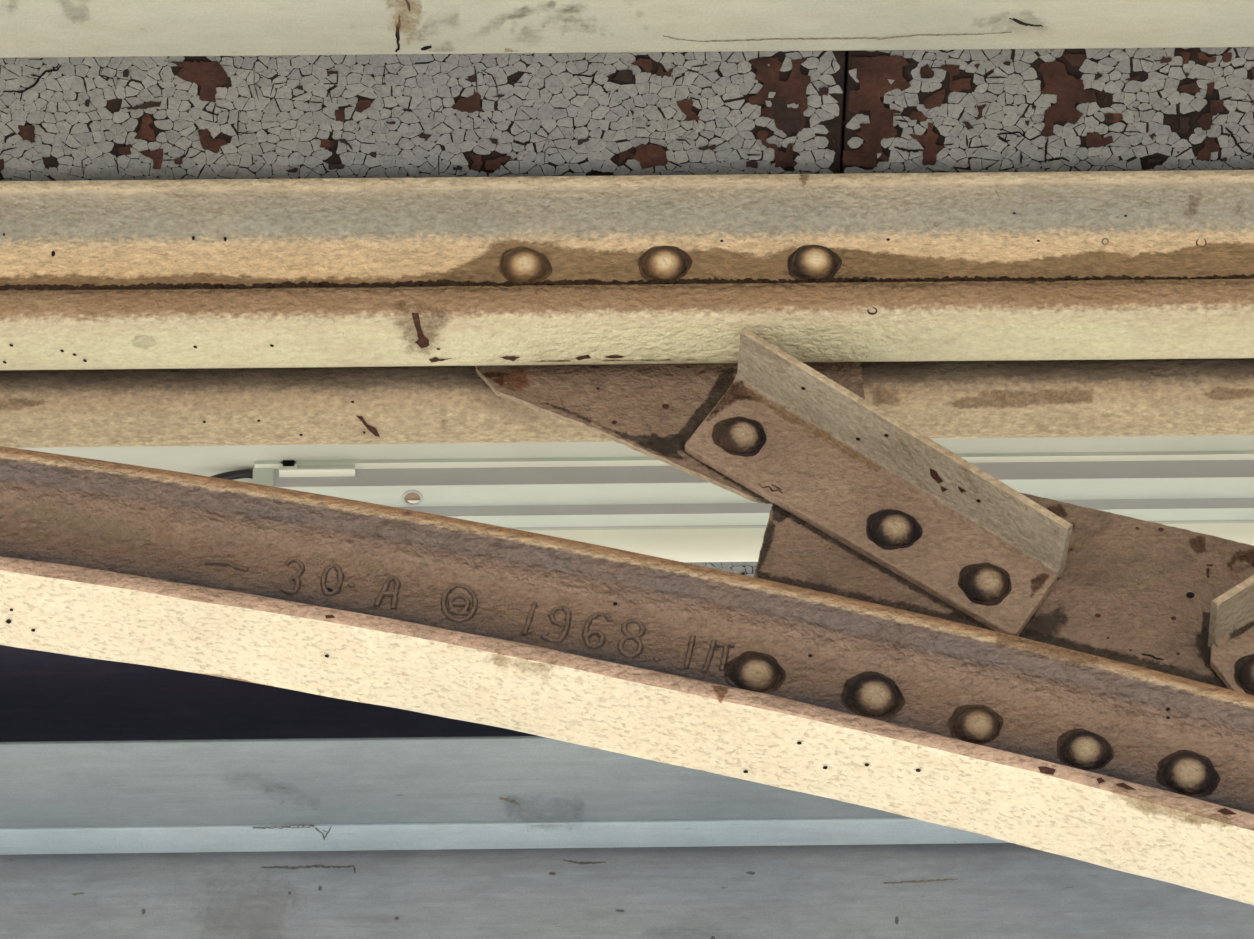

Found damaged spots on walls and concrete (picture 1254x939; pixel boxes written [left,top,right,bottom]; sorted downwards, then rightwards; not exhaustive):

peeling [163,60,228,102]
peeling [335,100,372,122]
peeling [451,76,523,113]
peeling [614,58,673,92]
peeling [748,57,829,167]
peeling [842,55,980,167]
peeling [1025,53,1123,147]
peeling [1160,51,1232,162]
peeling [18,125,35,143]
peeling [117,101,183,169]
peeling [197,128,228,153]
peeling [618,144,668,169]